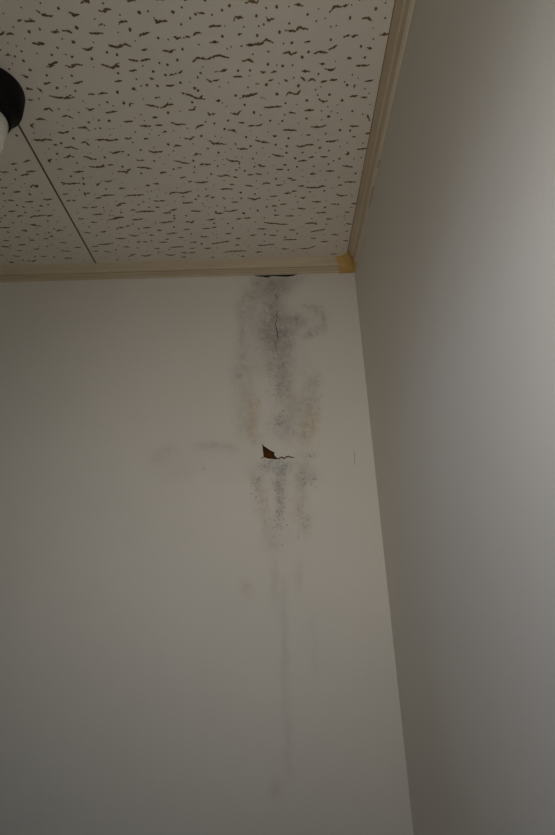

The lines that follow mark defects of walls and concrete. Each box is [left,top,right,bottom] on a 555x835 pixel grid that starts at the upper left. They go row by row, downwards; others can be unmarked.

spalling [262,445,295,460]